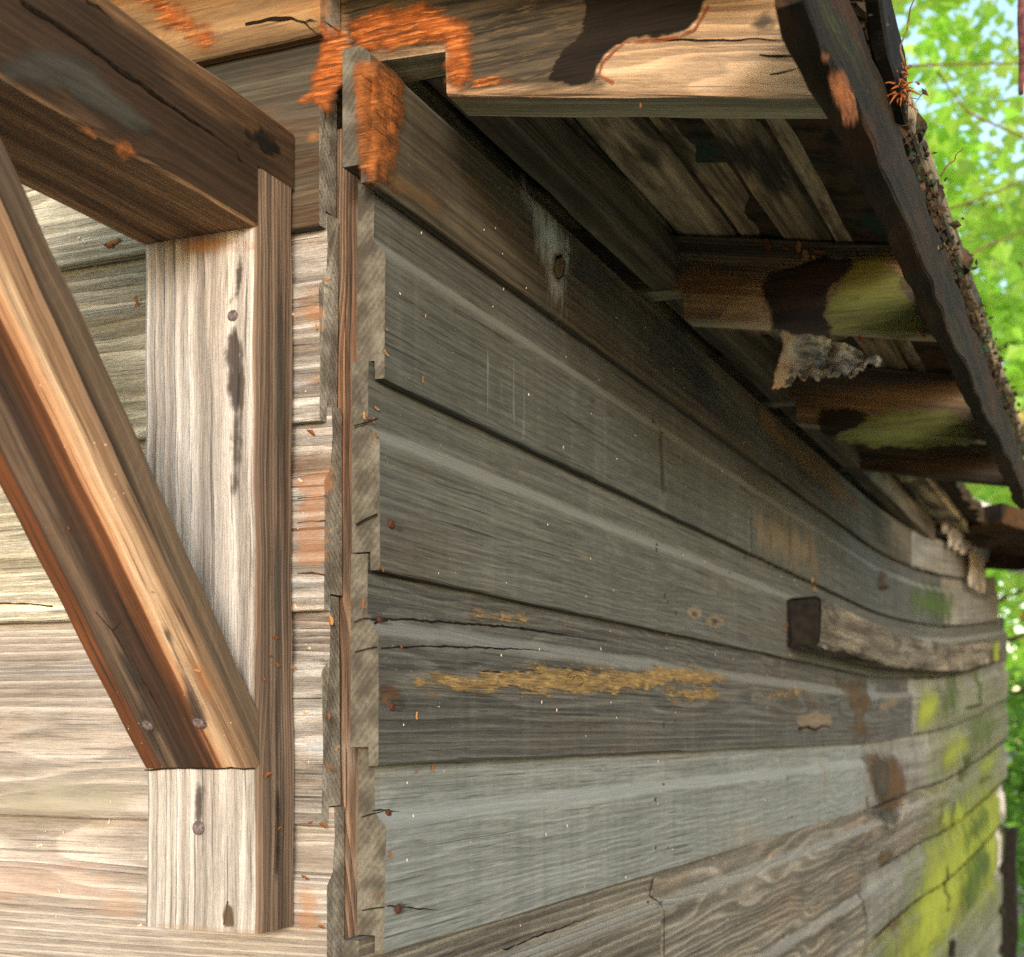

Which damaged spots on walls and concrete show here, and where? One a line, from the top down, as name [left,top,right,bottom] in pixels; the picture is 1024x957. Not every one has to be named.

leakage [225,328,244,492]
crack [354,617,599,673]
peeling [413,661,728,703]